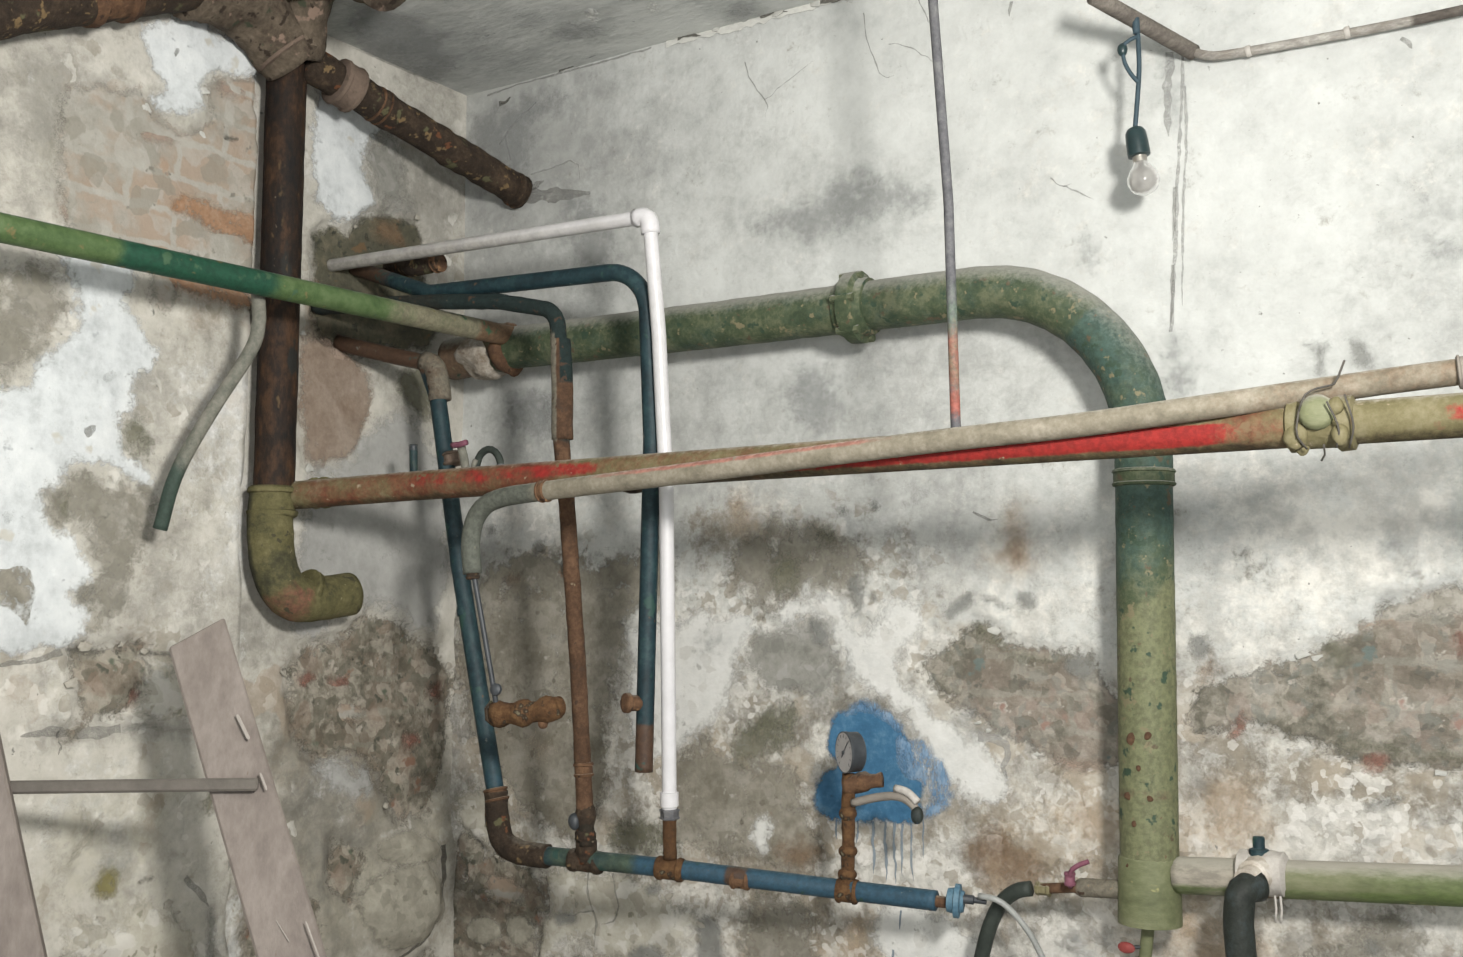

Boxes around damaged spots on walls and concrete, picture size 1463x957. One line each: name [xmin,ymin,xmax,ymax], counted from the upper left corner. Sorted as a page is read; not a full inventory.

spalling [55,75,258,268]
spalling [152,274,252,310]
leakage [47,471,154,628]
flaking render [280,548,676,839]
leakage [627,629,638,739]
leakage [653,519,1008,806]
spalling [1184,585,1463,776]
peeling [453,832,705,957]